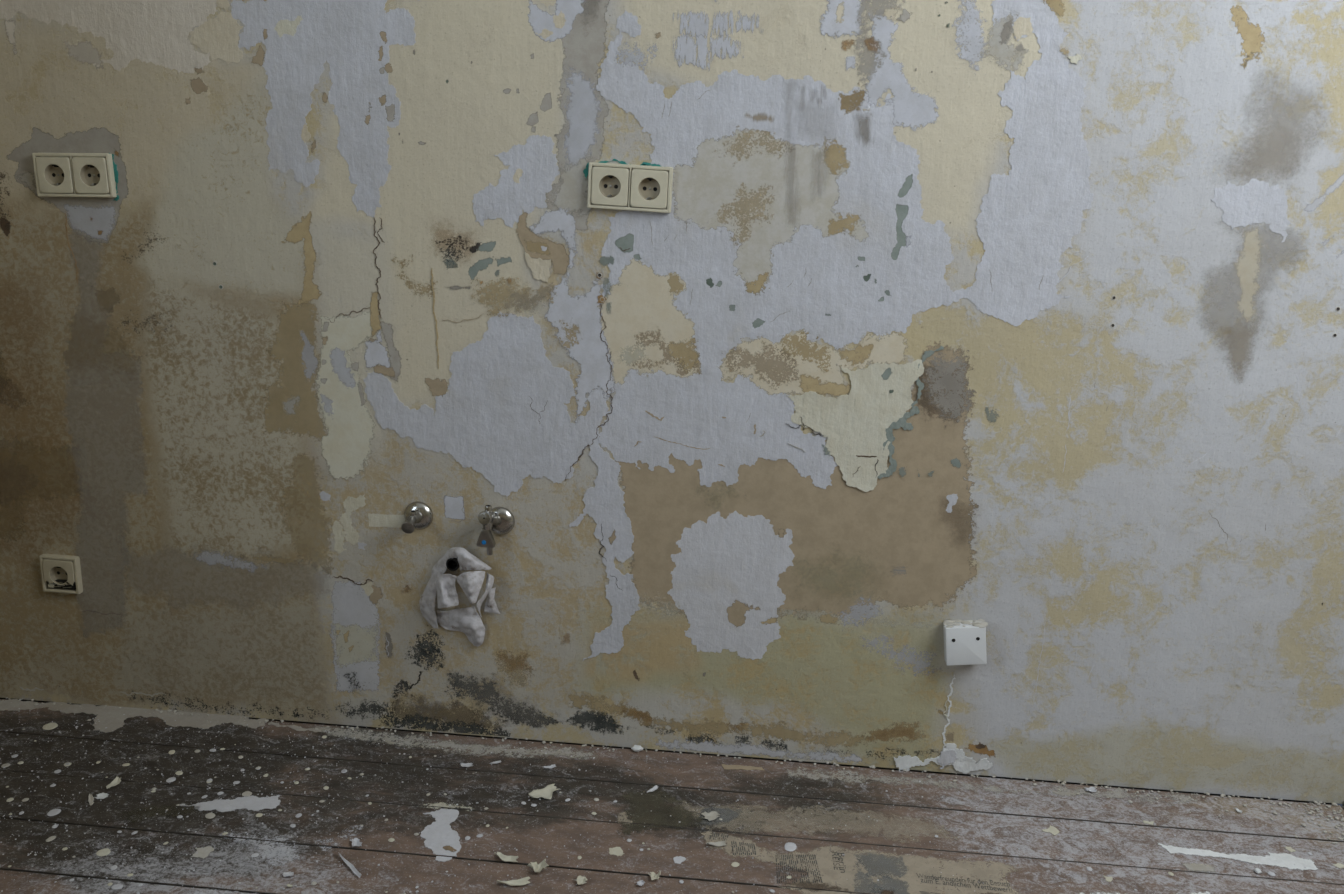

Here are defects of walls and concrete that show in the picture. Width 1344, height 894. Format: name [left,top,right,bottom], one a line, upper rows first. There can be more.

flaking render [1230,6,1265,68]
flaking render [527,0,609,231]
flaking render [443,212,570,283]
peeling [600,128,891,384]
peeling [891,174,913,260]
water stain [1208,228,1297,361]
peeling [263,211,402,554]
flaking render [615,312,999,620]
water stain [129,629,629,737]
water stain [646,725,718,745]
water stain [735,734,850,754]
crack [942,674,956,748]